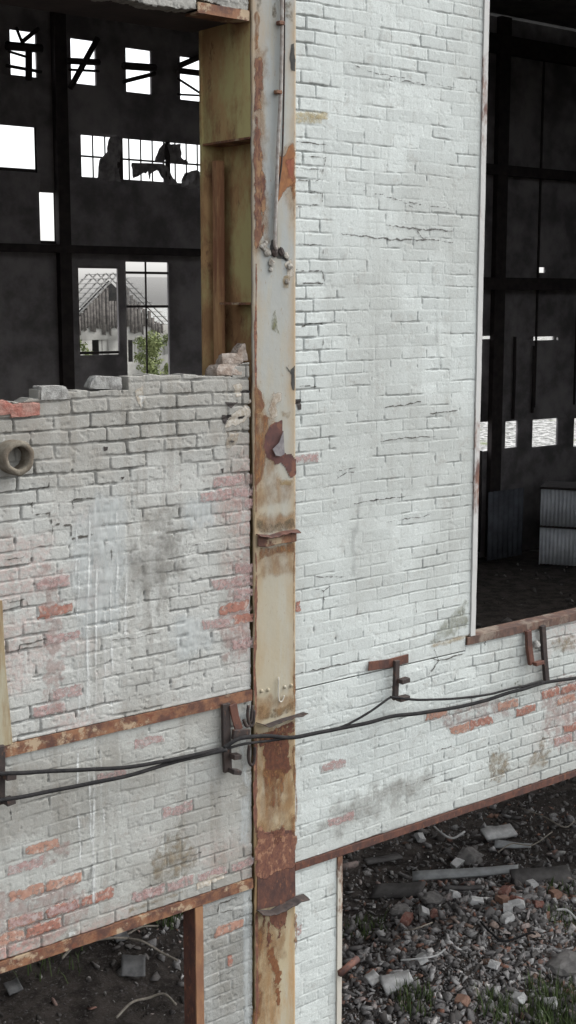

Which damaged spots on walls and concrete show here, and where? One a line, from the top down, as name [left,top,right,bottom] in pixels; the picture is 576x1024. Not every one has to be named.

corrosion [253,12,296,249]
crack [343,190,453,243]
crack [383,401,458,442]
peeling [202,563,253,630]
corrosion [253,543,297,879]
peeling [450,684,576,734]
peeling [554,722,576,746]
peeling [9,873,82,902]
peeling [0,886,114,948]
corrosion [253,911,297,1024]